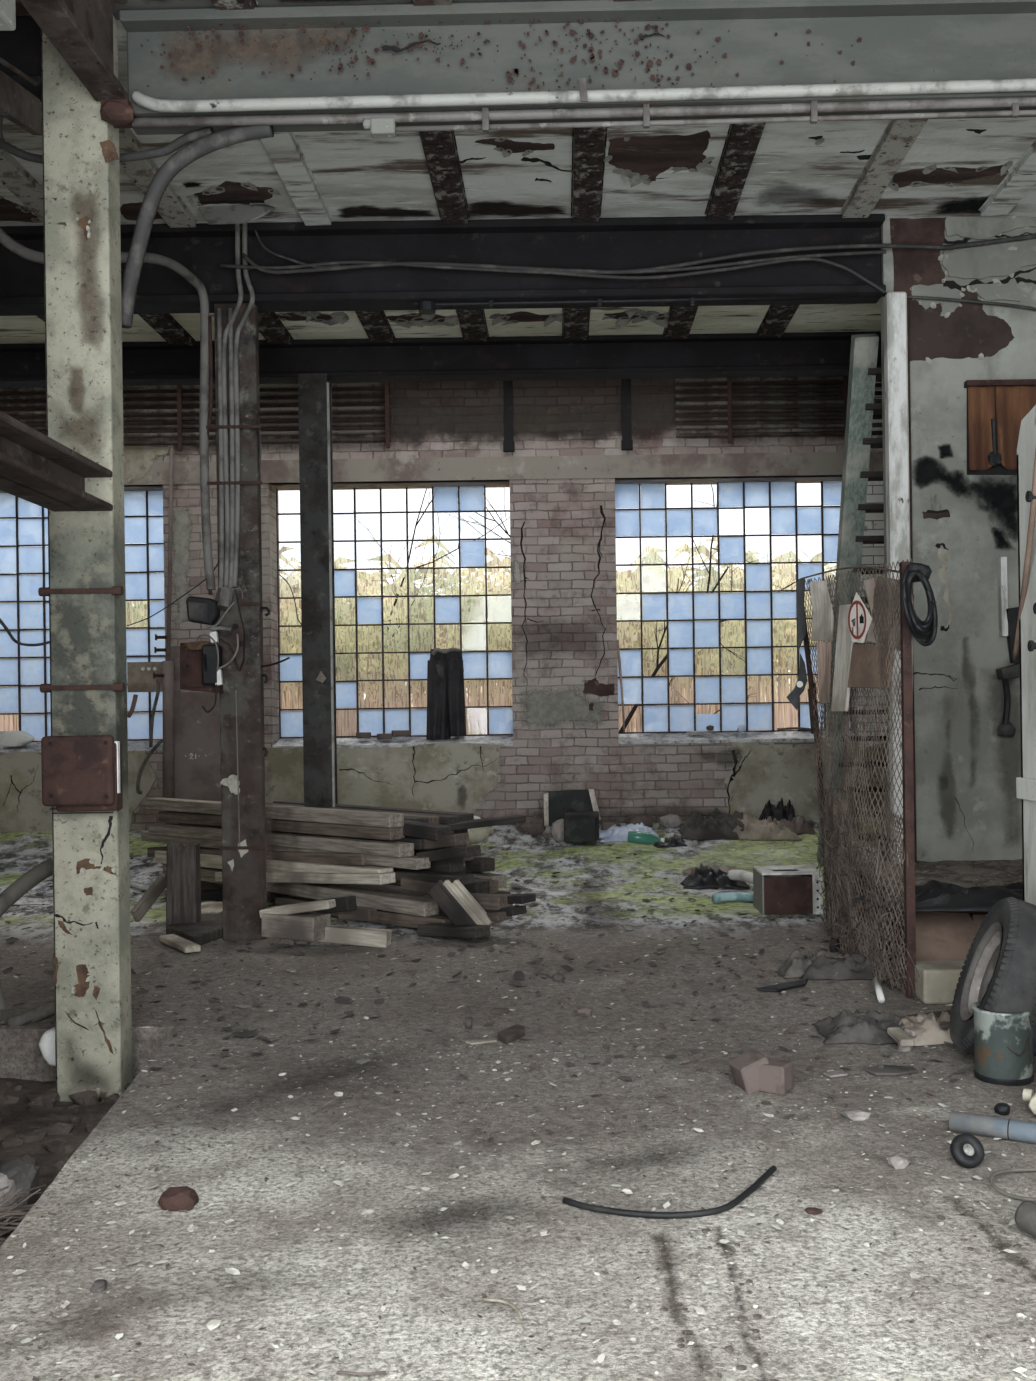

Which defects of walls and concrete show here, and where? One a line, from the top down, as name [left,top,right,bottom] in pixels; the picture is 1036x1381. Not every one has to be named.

rust [140,18,730,91]
peeling [603,130,715,188]
peeling [888,161,1013,192]
peeling [890,216,1036,364]
crack [588,505,606,676]
crack [339,746,499,796]
crack [727,750,751,814]